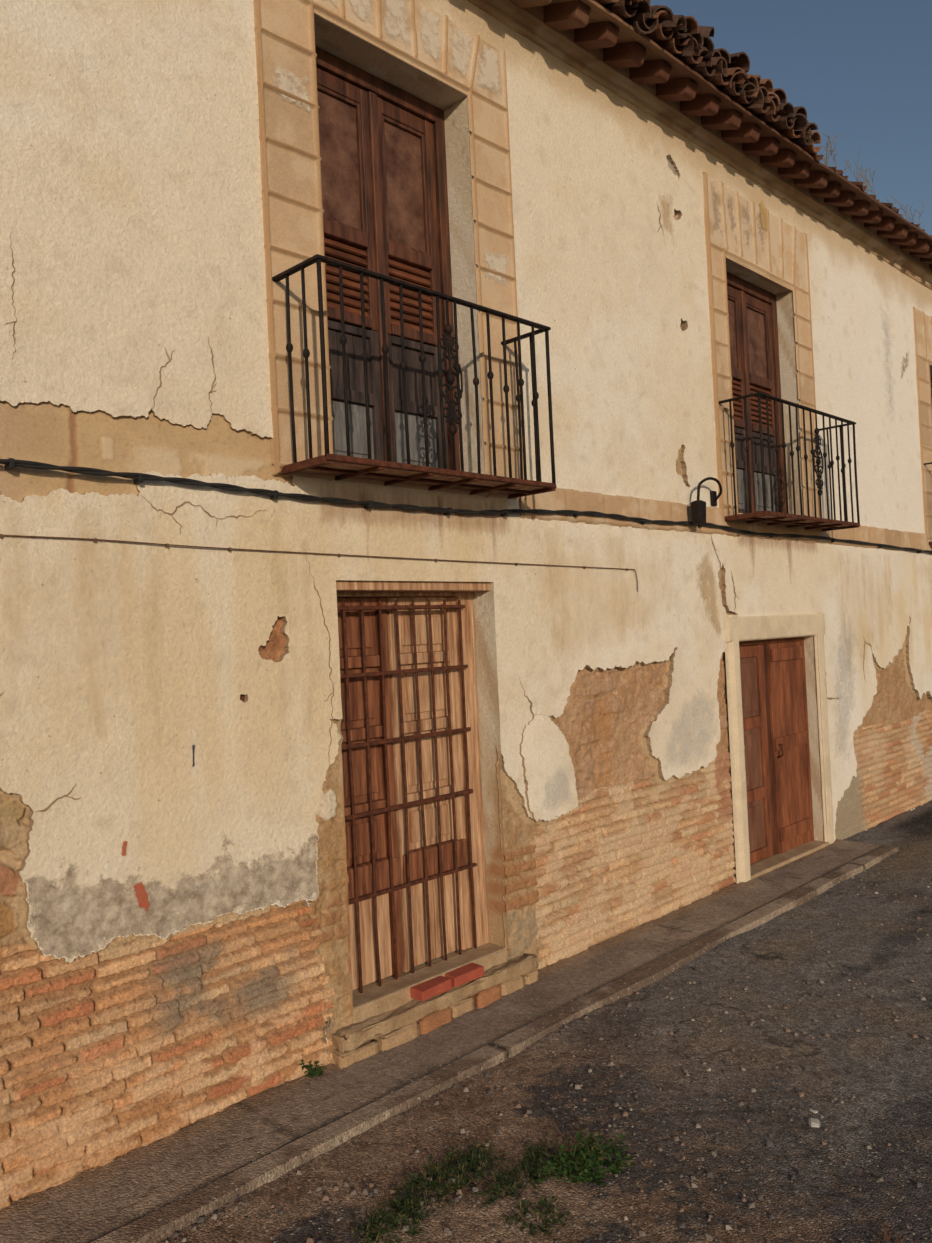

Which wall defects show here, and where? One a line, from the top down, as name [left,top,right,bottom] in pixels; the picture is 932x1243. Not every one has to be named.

crack [6,231,17,359]
crack [152,348,173,409]
crack [208,337,217,410]
flaking render [0,402,292,503]
crack [141,495,264,534]
peeling [700,556,734,632]
spalling [258,617,286,662]
spalling [835,634,932,840]
crack [36,785,80,812]
spalling [496,652,737,971]
spalling [0,719,352,1210]